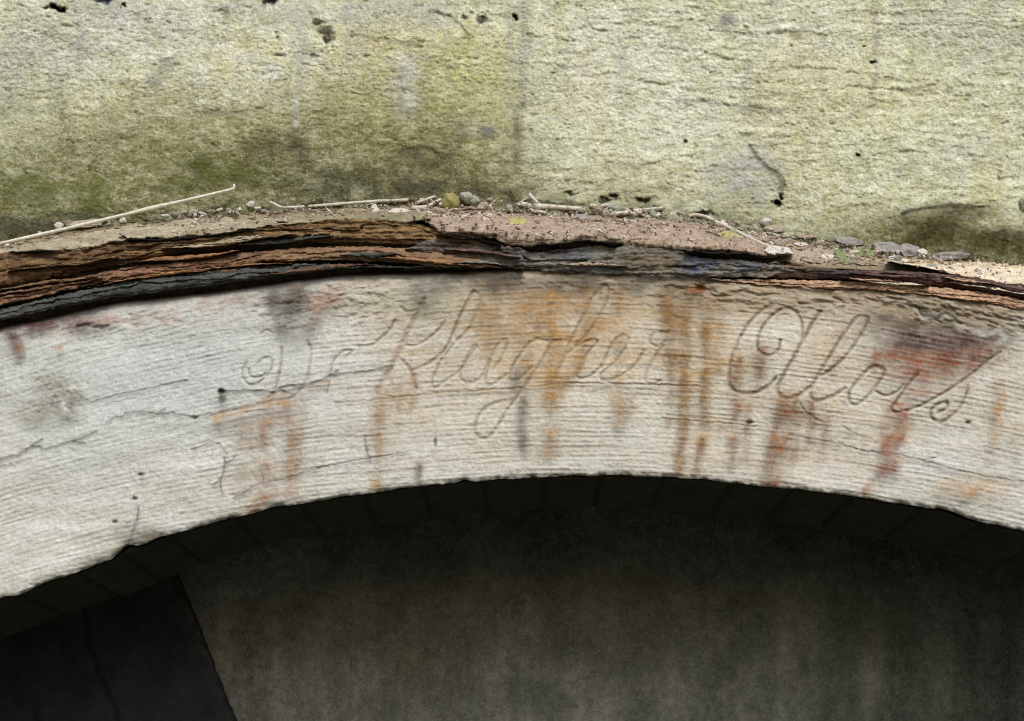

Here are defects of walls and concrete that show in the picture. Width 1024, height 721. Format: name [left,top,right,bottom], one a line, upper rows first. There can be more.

peeling [0,208,1024,340]
rust [662,299,722,349]
rust [874,348,984,378]
rust [667,354,710,473]
rust [777,398,830,427]
rust [879,431,904,473]